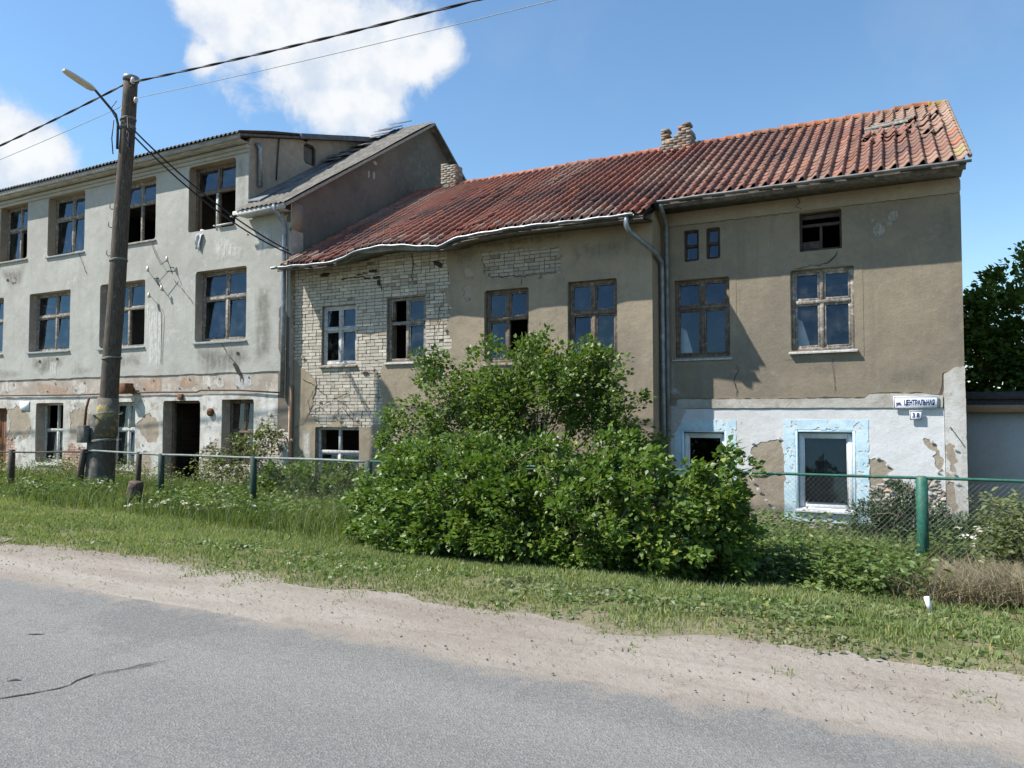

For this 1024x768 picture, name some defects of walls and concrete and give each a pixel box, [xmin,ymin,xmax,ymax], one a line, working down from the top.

flaking render [481,247,561,278]
flaking render [137,413,159,477]
flaking render [749,437,785,510]
flaking render [788,456,915,539]
flaking render [923,438,960,521]